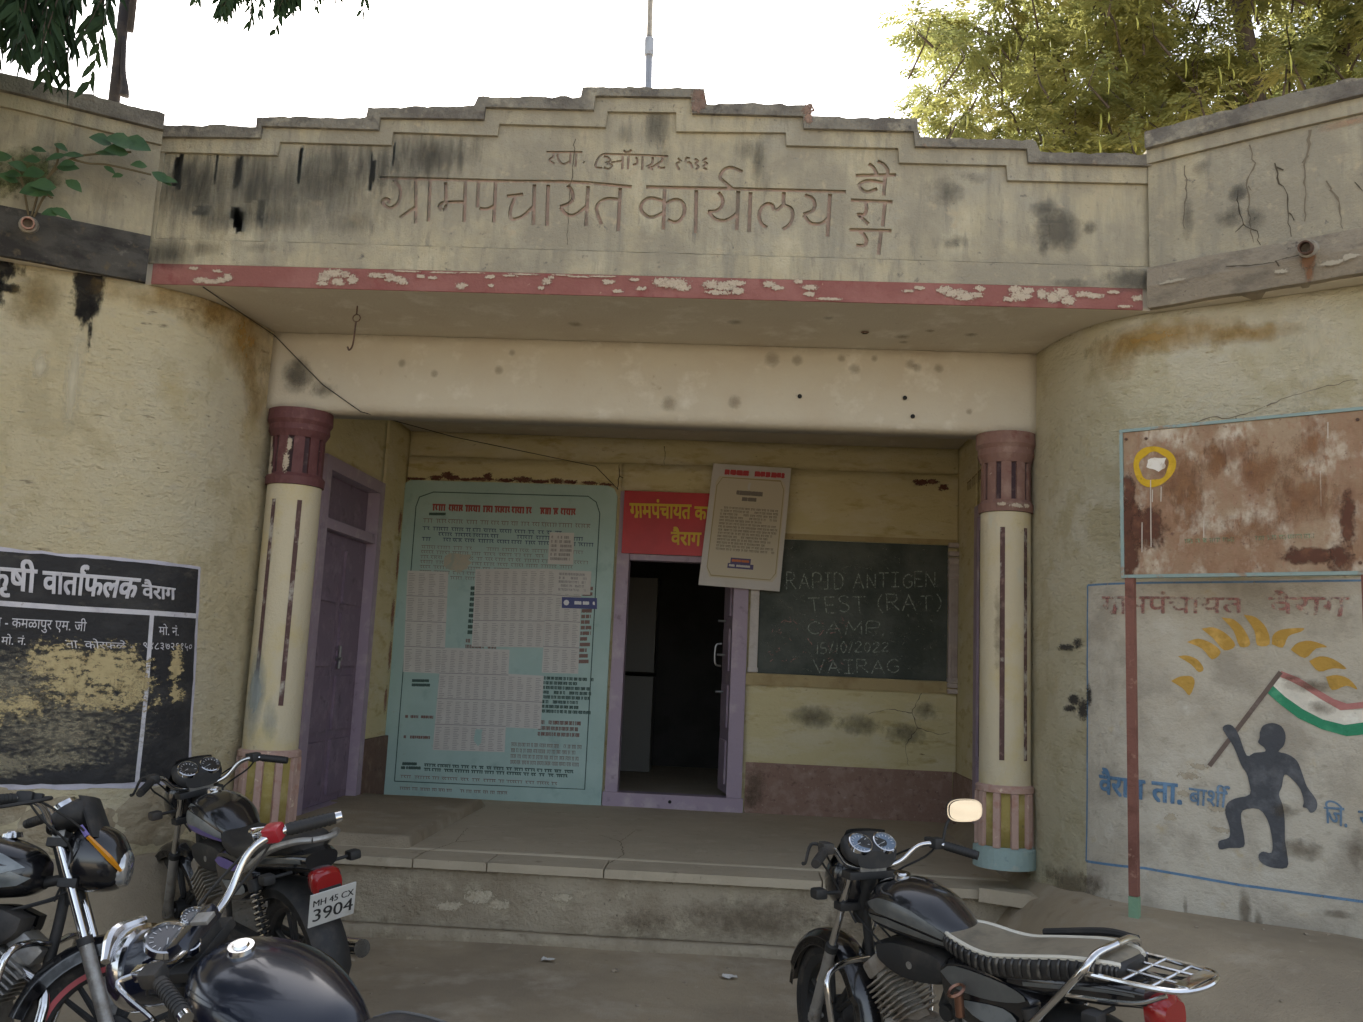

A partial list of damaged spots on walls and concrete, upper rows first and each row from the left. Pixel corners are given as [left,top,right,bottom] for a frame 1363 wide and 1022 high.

crack [1181,166,1189,226]
crack [1226,130,1363,267]
peeling [1316,251,1360,266]
damp [0,261,44,307]
peeling [316,268,841,301]
damp [68,272,105,408]
peeling [268,436,293,474]
damp [1058,638,1081,650]
damp [1064,685,1091,721]